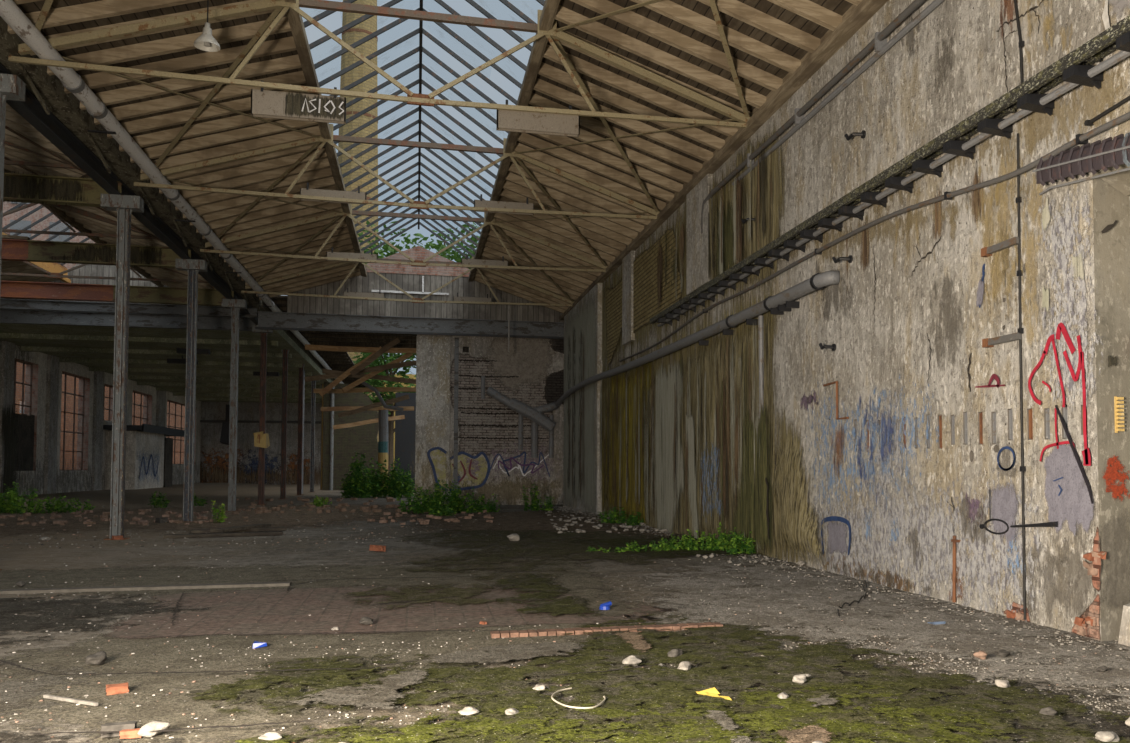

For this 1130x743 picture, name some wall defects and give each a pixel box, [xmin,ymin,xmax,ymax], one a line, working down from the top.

water stain [708,143,772,277]
flaking render [450,337,564,456]
water stain [459,293,768,538]
flaking render [1071,527,1107,640]